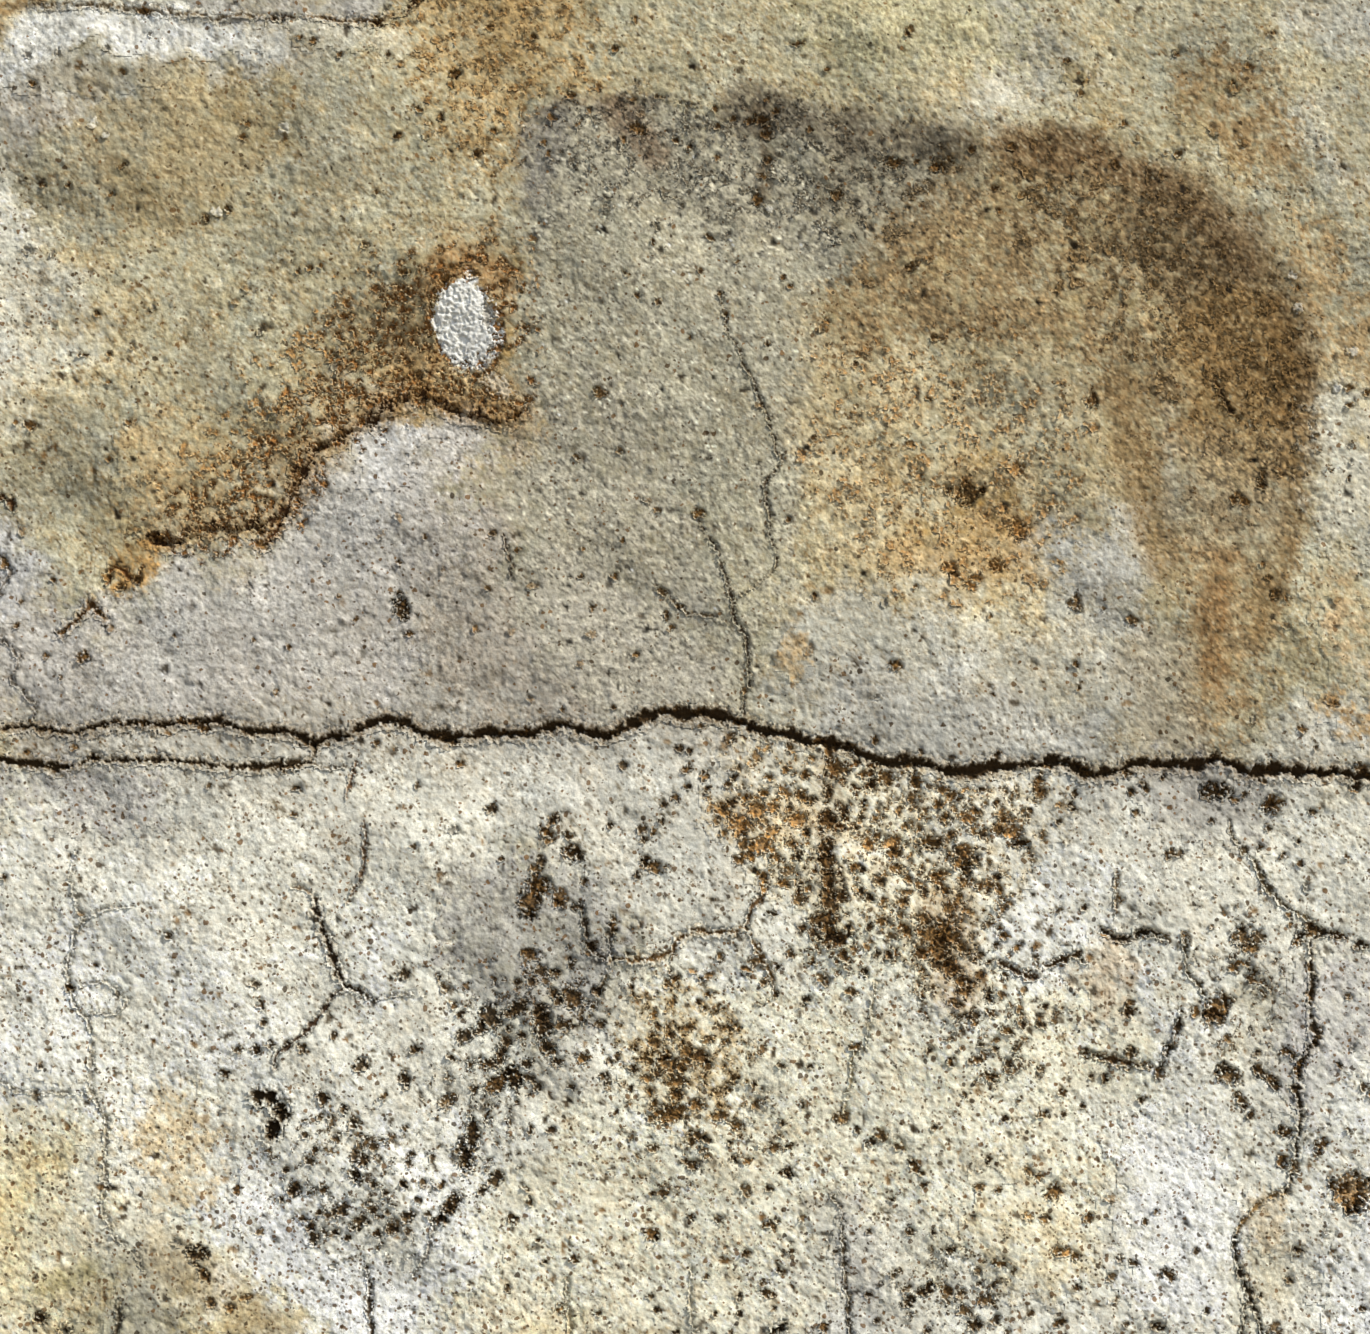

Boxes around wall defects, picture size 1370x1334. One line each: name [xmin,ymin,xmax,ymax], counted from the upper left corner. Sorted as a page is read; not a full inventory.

flaking render [77,343,136,358]
flaking render [201,204,233,223]
flaking render [0,396,509,752]
flaking render [295,262,325,275]
corrosion [100,214,559,601]
spalling [408,244,529,422]
damp [413,0,1370,860]
crack [0,286,1370,1334]
corrosion [694,724,1083,1026]